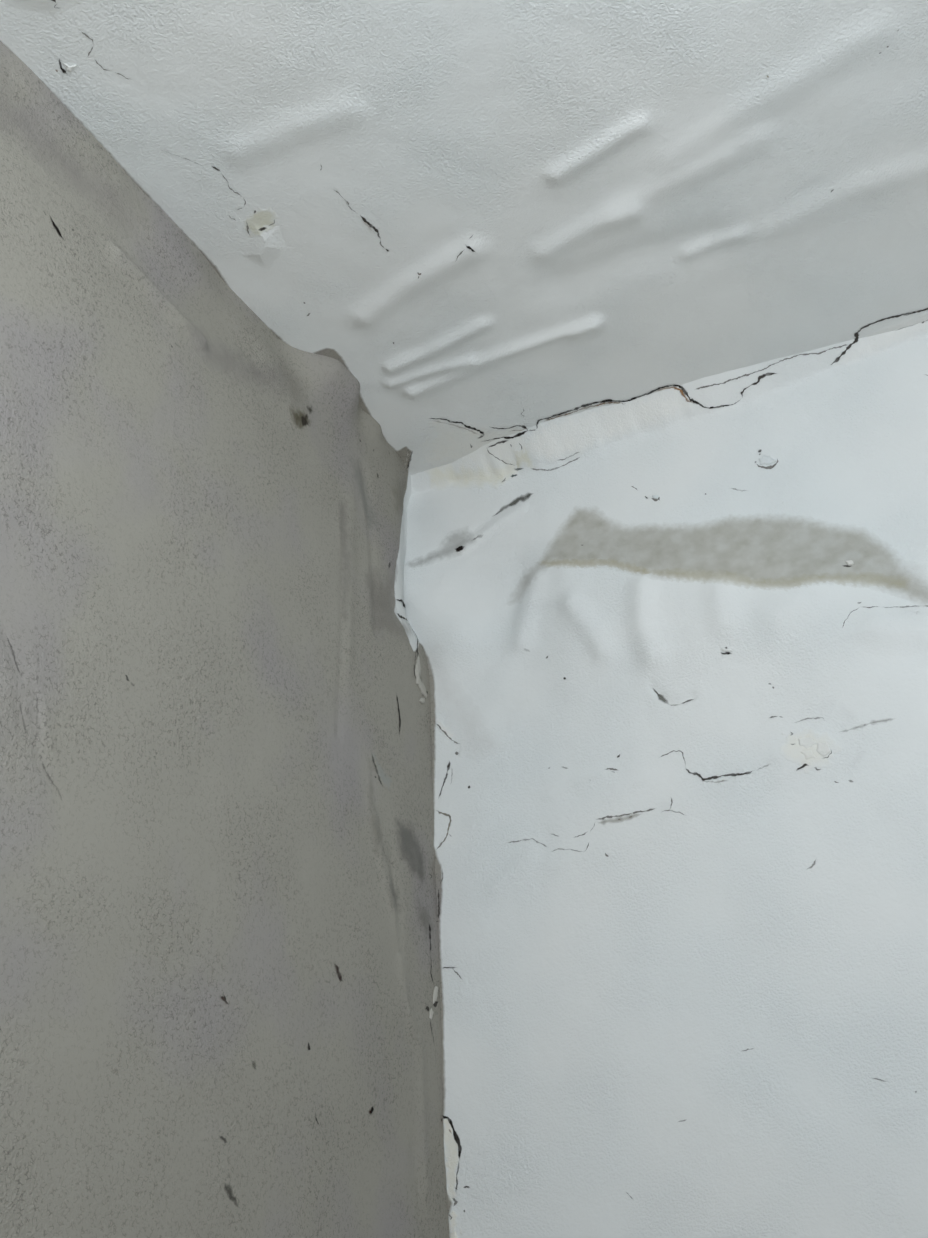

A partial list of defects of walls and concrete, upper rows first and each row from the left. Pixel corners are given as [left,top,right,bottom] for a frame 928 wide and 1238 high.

crack [321,166,389,251]
crack [430,308,928,482]
leakage [507,505,928,608]
crack [662,750,752,781]
crack [509,798,684,851]
peeling [443,1117,465,1238]